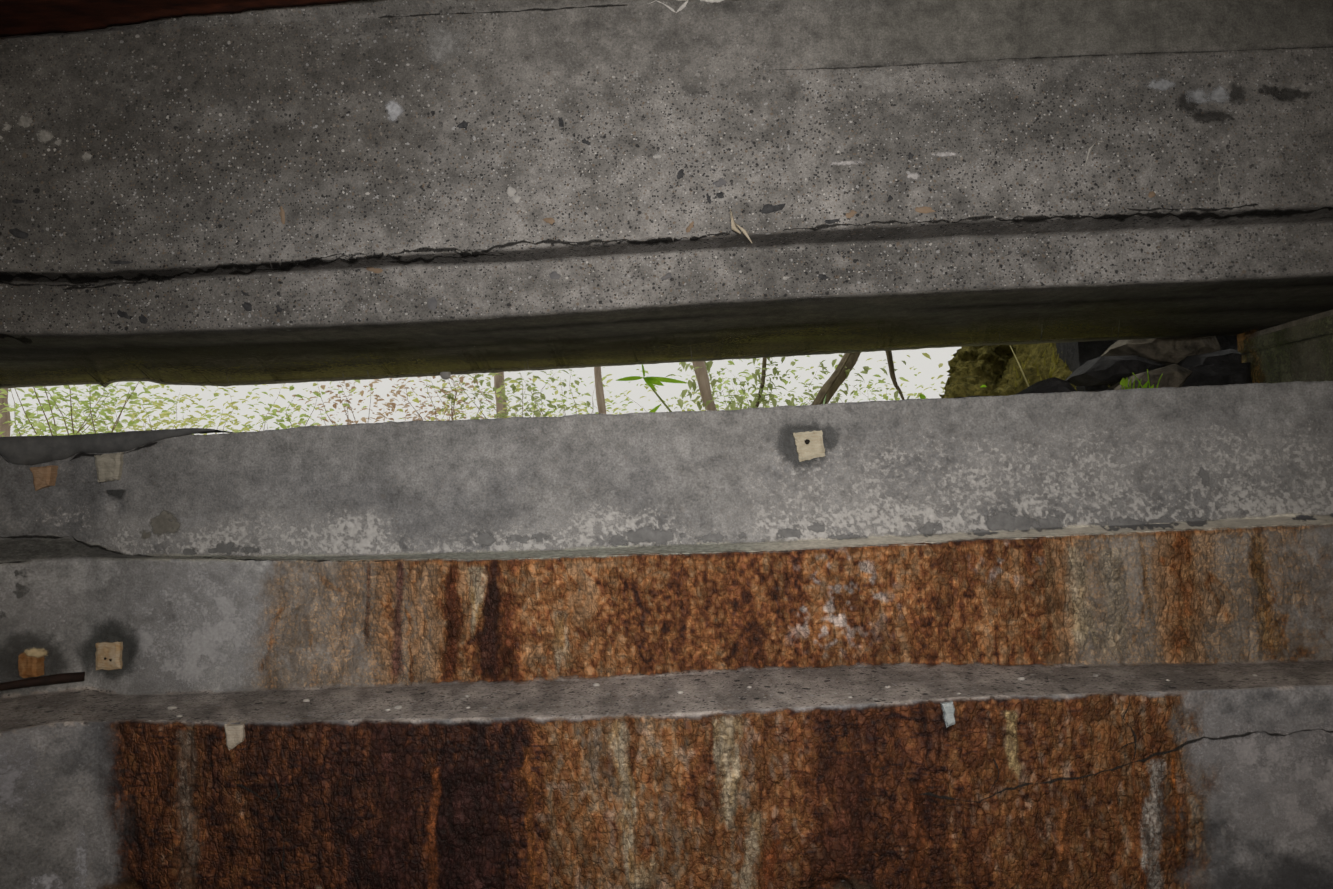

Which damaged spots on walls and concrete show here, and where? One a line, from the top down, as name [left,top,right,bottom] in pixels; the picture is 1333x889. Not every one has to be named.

crack [783,204,1333,231]
crack [0,232,730,290]
peeling [141,510,180,539]
peeling [183,541,260,555]
rust [259,525,1333,689]
crack [920,699,1333,803]
rust [109,693,1210,889]